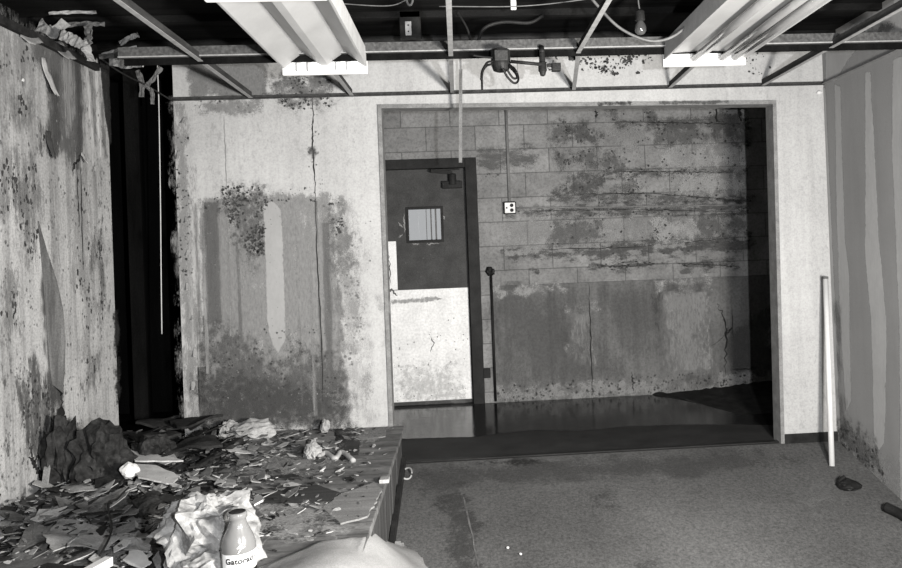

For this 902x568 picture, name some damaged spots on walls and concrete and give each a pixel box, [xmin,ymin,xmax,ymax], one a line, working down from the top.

water stain [0,33,111,343]
water stain [7,347,107,481]
water stain [190,185,364,432]
crack [308,99,323,398]
crack [710,304,757,374]